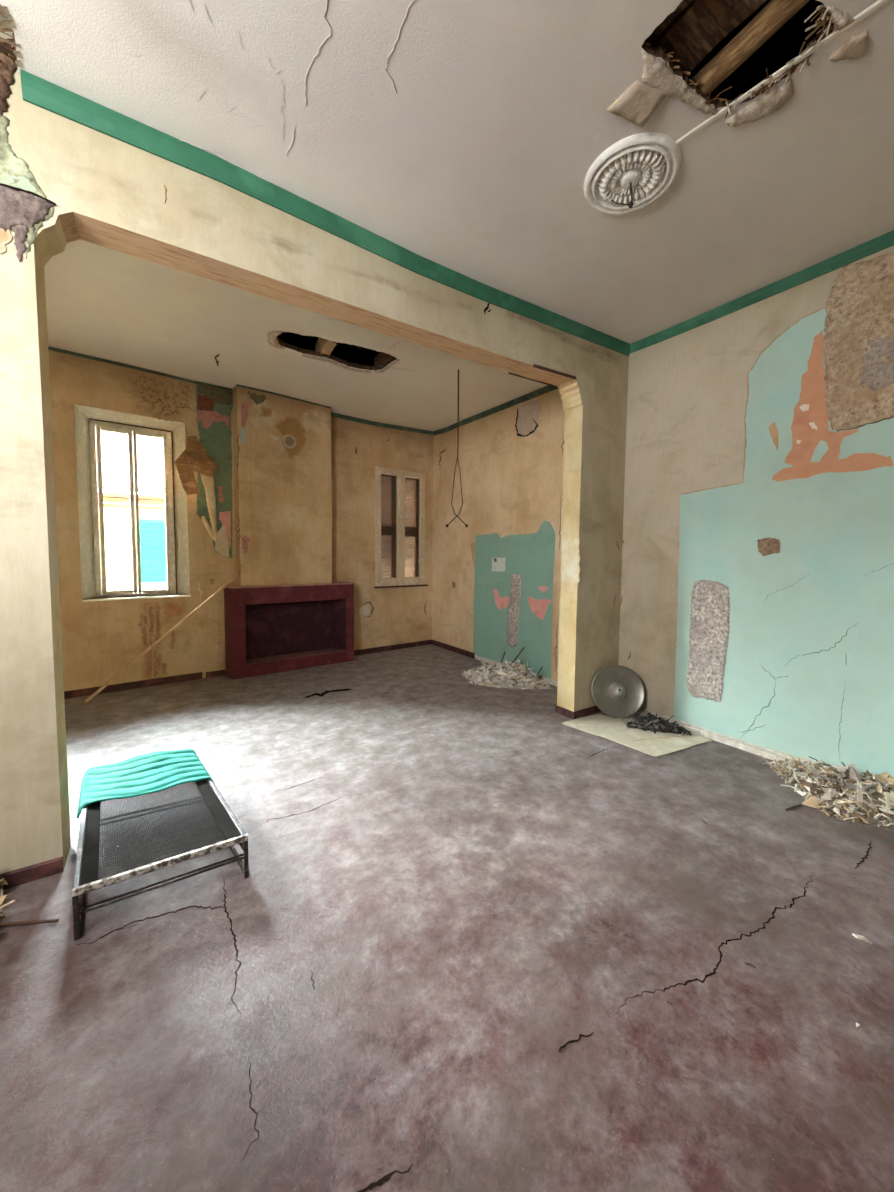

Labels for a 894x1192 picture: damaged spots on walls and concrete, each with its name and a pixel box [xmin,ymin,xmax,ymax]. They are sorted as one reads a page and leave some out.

peeling [0,6,15,29]
spalling [0,44,57,262]
crack [180,140,269,182]
spalling [267,331,285,349]
peeling [196,384,266,558]
peeling [674,252,894,777]
peeling [470,520,555,679]
crack [76,881,241,1015]
crack [615,871,815,1014]
crack [558,1033,593,1052]
crack [239,1057,259,1164]
crack [357,1164,413,1192]